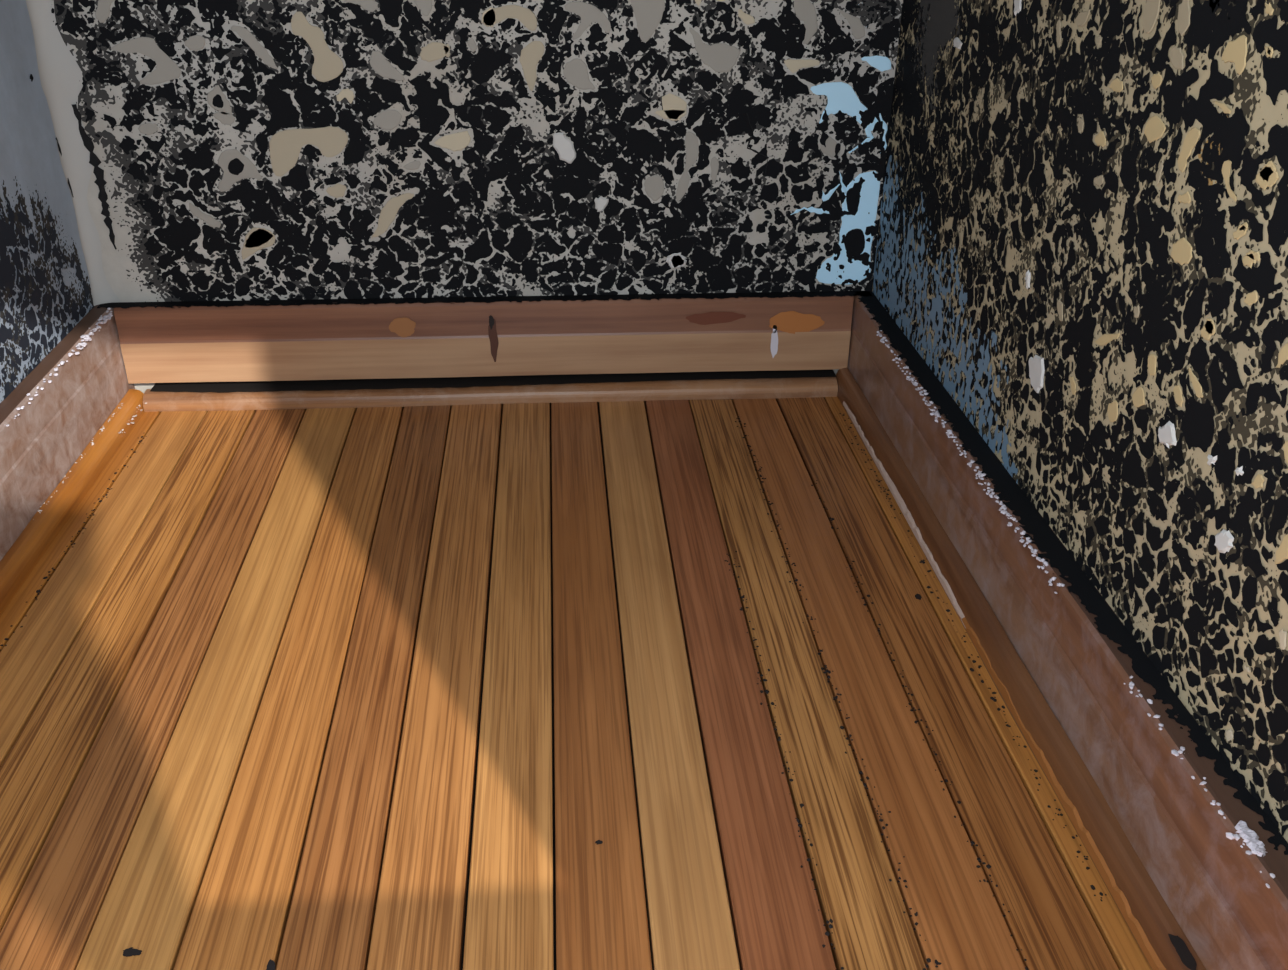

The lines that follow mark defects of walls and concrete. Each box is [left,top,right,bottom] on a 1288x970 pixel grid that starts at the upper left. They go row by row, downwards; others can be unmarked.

flaking render [784,0,820,73]
flaking render [839,10,865,39]
peeling [861,56,891,72]
water stain [212,94,223,108]
water stain [228,158,244,175]
peeling [790,82,887,285]
water stain [1280,251,1288,283]
water stain [0,176,94,401]
water stain [935,320,961,371]
water stain [1228,575,1240,600]
water stain [1191,776,1226,819]
water stain [1226,832,1258,855]